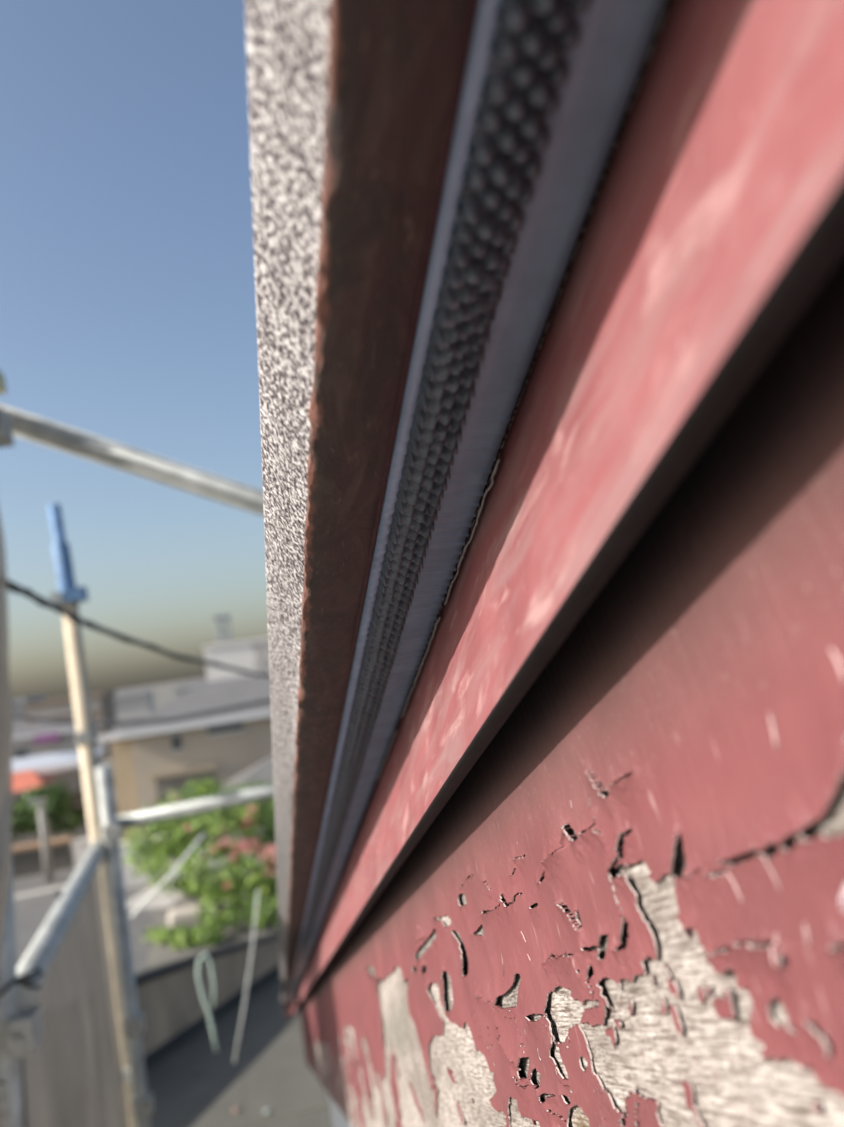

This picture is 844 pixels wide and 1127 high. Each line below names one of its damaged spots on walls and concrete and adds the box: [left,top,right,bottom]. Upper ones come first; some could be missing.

crack [713,830,813,874]
peeling [307,966,540,1127]
peeling [550,857,844,1127]